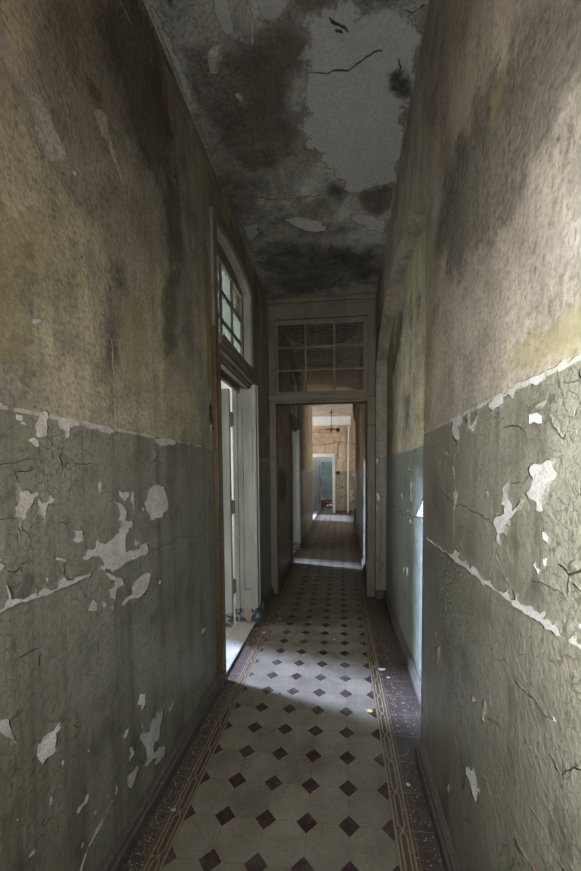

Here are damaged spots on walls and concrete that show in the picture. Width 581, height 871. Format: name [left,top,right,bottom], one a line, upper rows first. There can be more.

damp [0,34,69,167]
damp [94,109,125,185]
damp [191,31,303,169]
crack [328,17,349,34]
crack [300,49,402,77]
flaking render [296,0,421,196]
mould [390,70,412,98]
peeling [451,351,581,445]
peeling [0,481,169,616]
crack [441,404,581,605]
peeling [492,455,556,548]
crack [548,752,581,791]